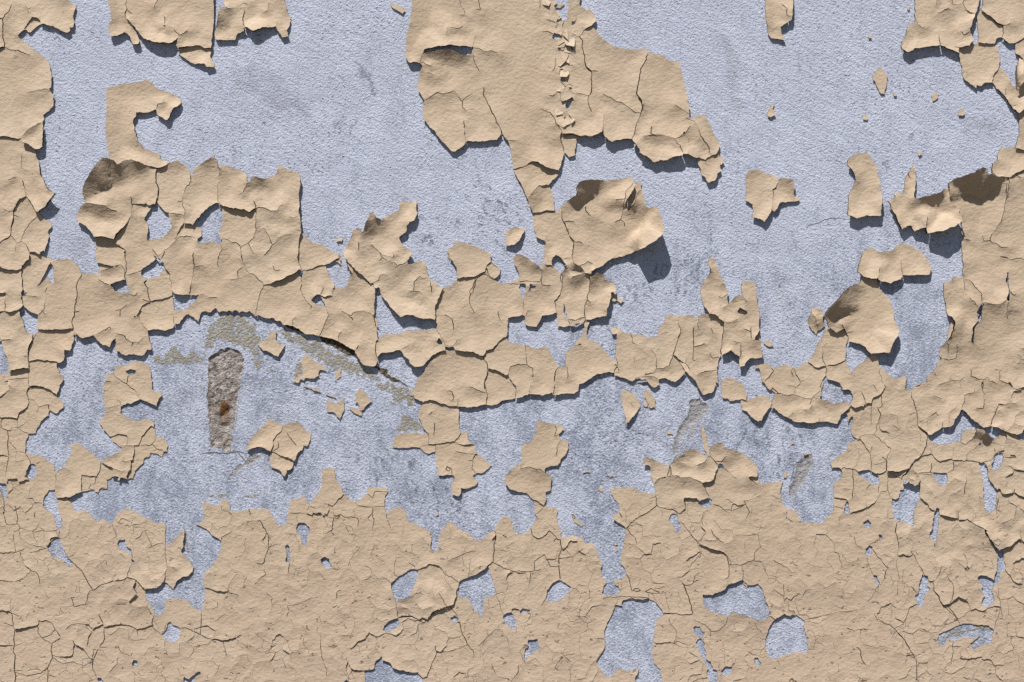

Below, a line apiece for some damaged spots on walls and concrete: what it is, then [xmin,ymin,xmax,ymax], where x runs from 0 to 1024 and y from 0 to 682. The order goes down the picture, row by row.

crack [616,56,647,133]
peeling [558,26,724,183]
peeling [0,0,665,411]
rust [218,401,229,425]
crack [284,325,408,387]
peeling [911,147,1024,445]
crack [0,567,140,682]
peeling [93,494,496,682]
crack [401,595,474,677]
peeling [422,487,775,682]
crack [604,577,695,615]
peeling [699,443,1024,682]